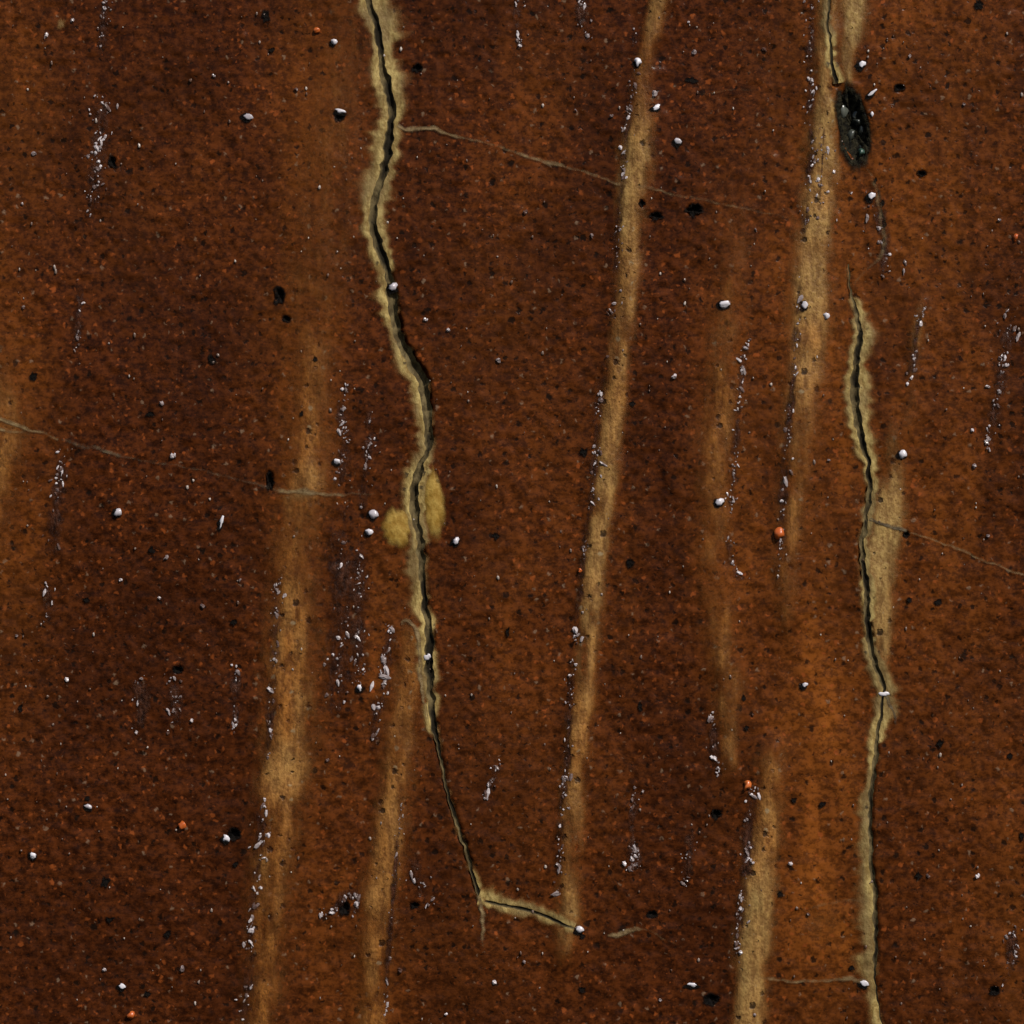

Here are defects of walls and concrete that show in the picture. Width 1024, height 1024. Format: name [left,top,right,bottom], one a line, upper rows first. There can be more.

crack [358,0,576,935]
damp [560,0,666,949]
crack [611,928,637,937]
damp [734,753,782,1024]
damp [785,0,865,557]
crack [786,264,907,1024]
spalling [834,82,872,169]